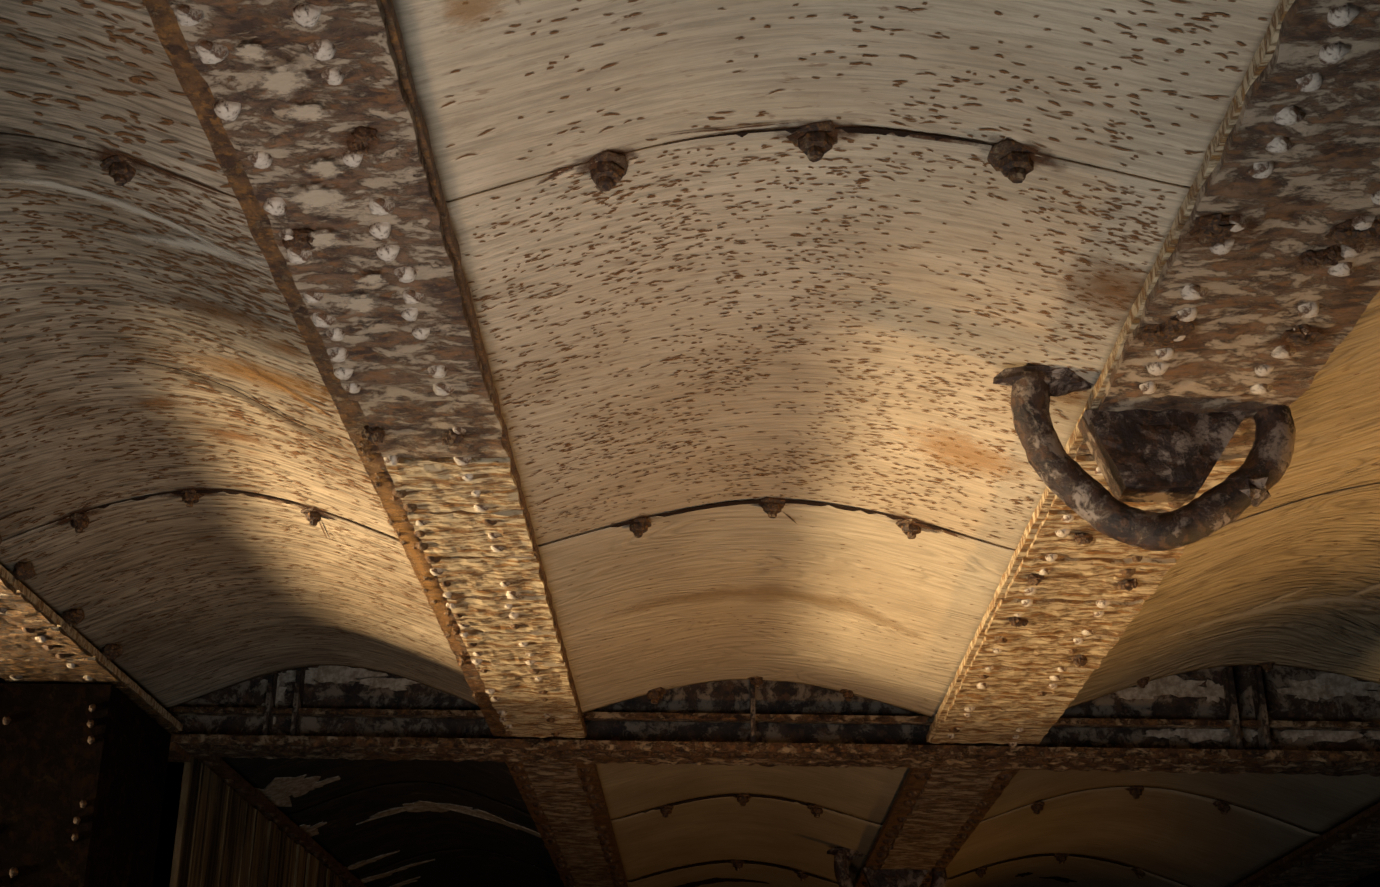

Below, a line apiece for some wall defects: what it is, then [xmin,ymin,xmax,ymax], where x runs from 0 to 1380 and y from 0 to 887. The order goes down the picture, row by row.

corrosion [1297,217,1380,268]
corrosion [465,0,1256,541]
corrosion [1275,324,1333,351]
corrosion [0,0,482,703]
corrosion [1071,532,1093,545]
corrosion [1026,573,1047,586]
corrosion [1113,579,1138,591]
corrosion [1006,617,1028,628]
corrosion [1070,655,1088,667]